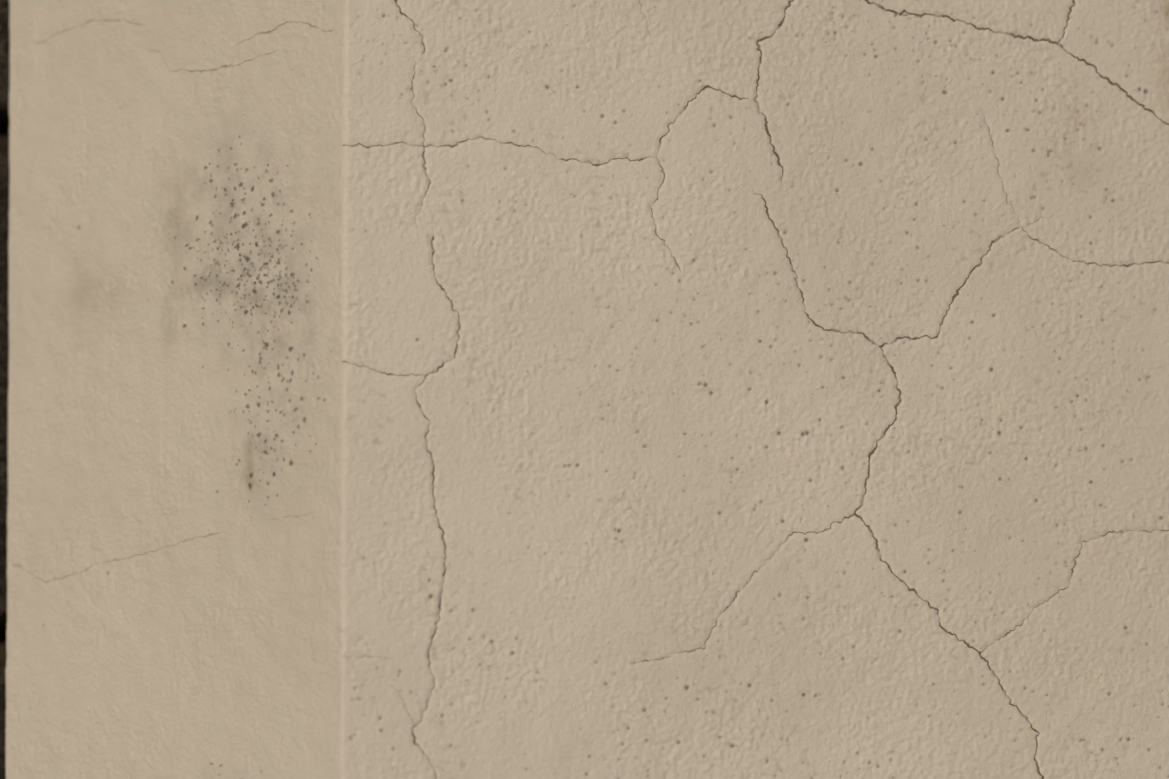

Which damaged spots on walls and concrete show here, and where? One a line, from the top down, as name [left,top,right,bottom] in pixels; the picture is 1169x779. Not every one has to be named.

crack [343,0,793,266]
crack [865,0,1169,125]
crack [342,236,460,665]
crack [786,130,1159,779]
crack [632,571,758,664]